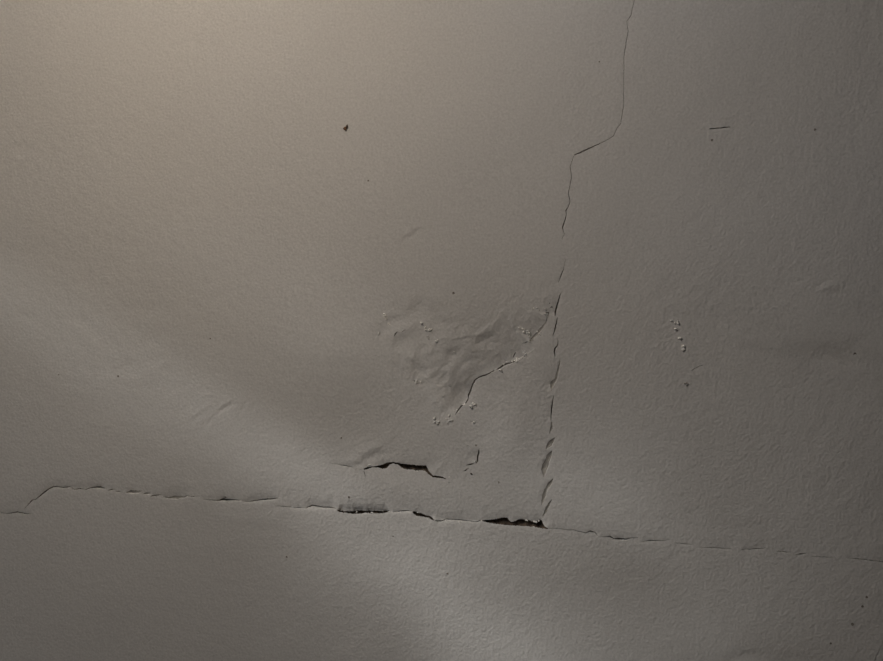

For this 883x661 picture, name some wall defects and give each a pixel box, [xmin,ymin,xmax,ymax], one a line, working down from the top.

crack [562,0,635,238]
crack [1,260,883,562]